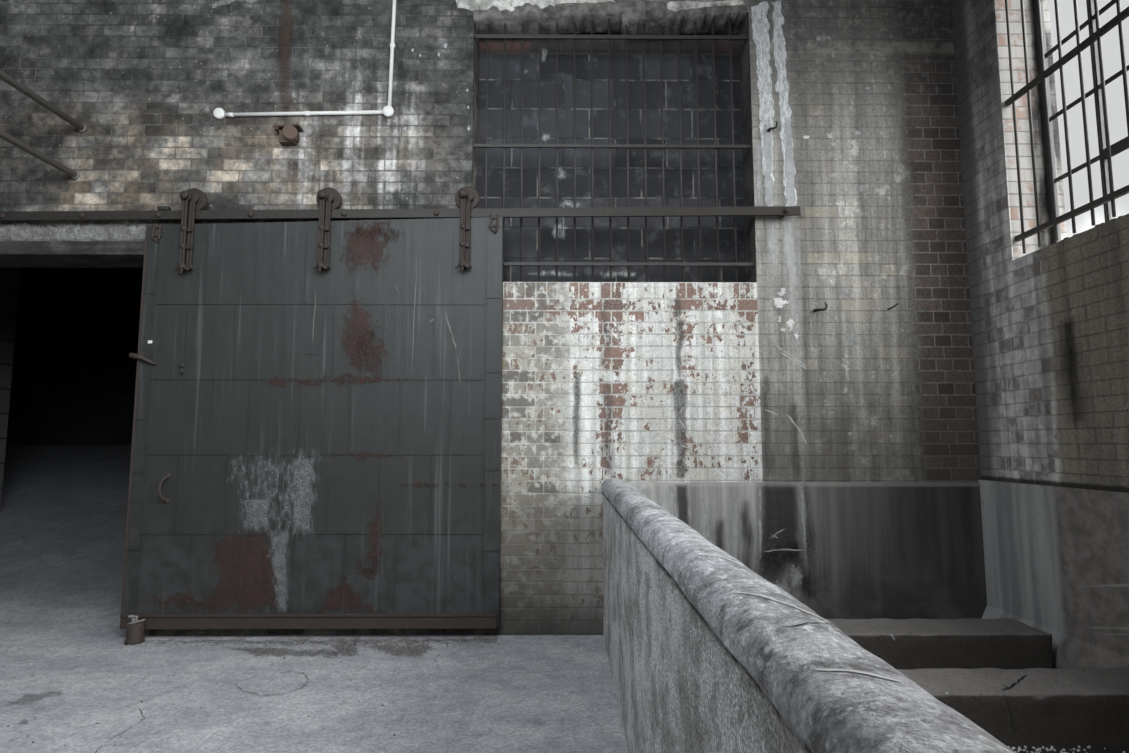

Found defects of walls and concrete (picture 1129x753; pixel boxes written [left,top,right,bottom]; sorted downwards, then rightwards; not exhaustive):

water stain [751,0,803,361]
water stain [643,299,813,592]